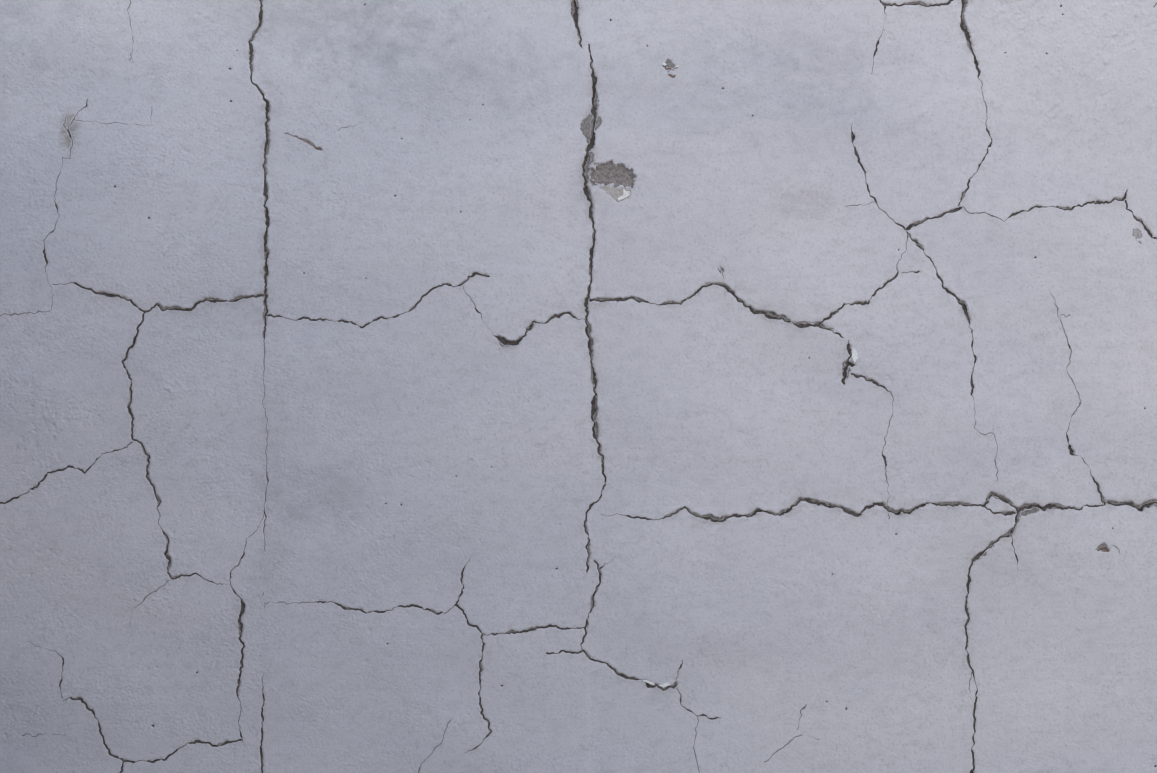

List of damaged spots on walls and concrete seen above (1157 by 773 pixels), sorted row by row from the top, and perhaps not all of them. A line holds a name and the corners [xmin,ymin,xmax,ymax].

crack [0,0,490,773]
crack [264,556,721,773]
spalling [589,160,636,203]
crack [491,0,1157,773]